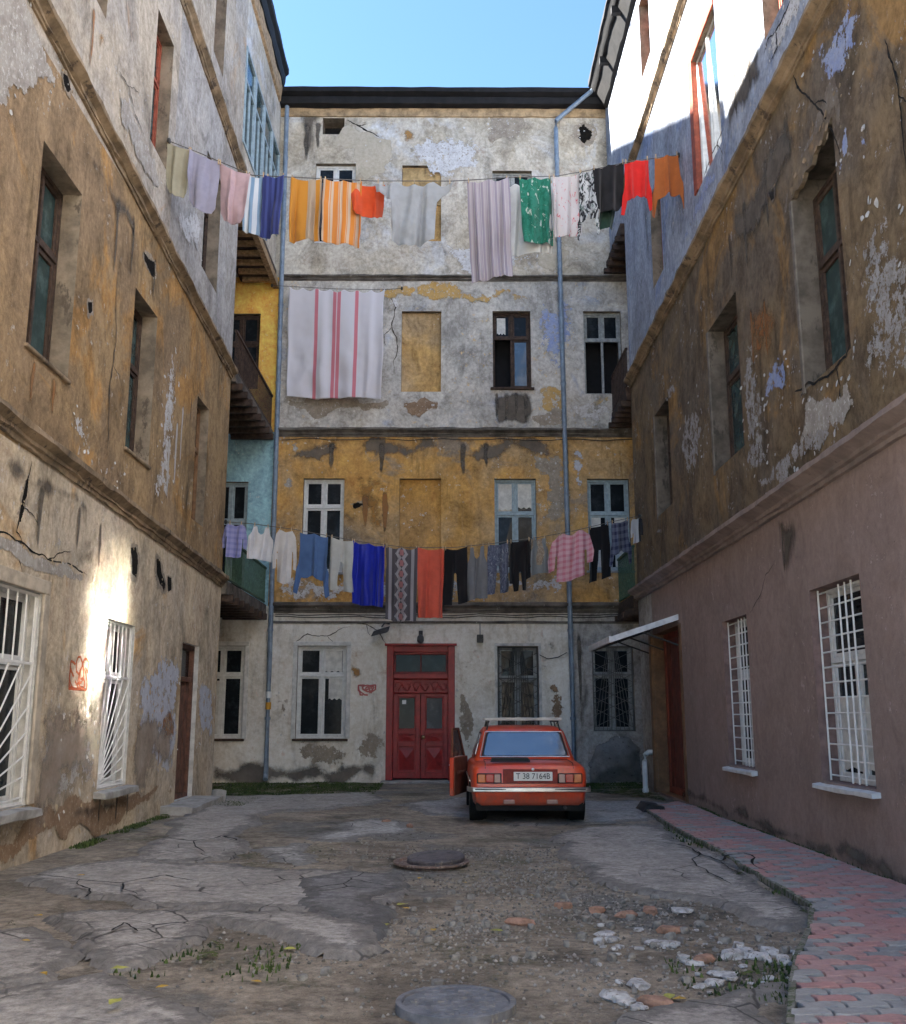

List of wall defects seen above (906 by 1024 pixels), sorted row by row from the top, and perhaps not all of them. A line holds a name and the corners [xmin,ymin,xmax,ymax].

peeling [410,117,526,177]
peeling [768,0,862,212]
crack [793,76,840,154]
crack [885,41,906,169]
peeling [849,196,906,392]
peeling [155,347,184,504]
leakage [295,443,336,467]
leakage [363,437,434,471]
leakage [460,438,549,474]
peeling [740,346,854,494]
crack [0,463,87,575]
leakage [214,762,374,783]